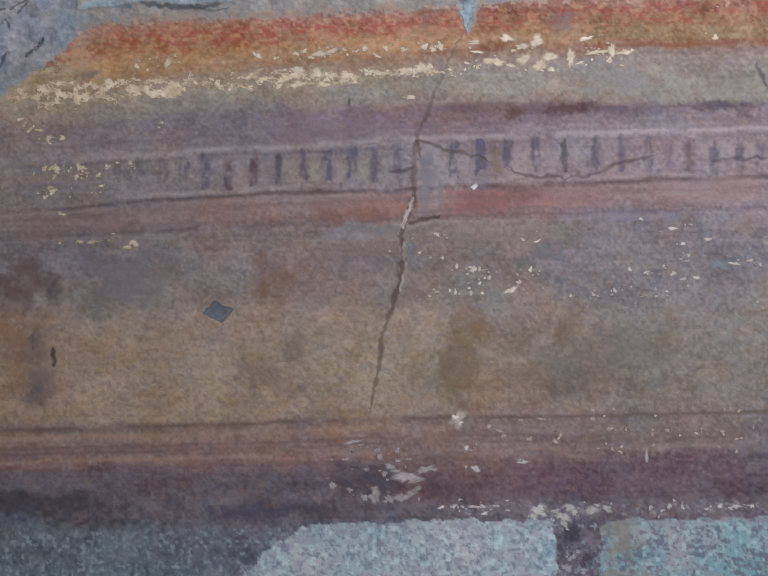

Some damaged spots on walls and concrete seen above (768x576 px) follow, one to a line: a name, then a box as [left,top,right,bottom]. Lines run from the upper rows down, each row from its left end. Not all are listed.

peeling [8,34,557,110]
peeling [567,34,641,67]
crack [394,197,441,296]
peeling [330,440,437,503]
peeling [437,498,510,515]
peeling [527,501,612,530]